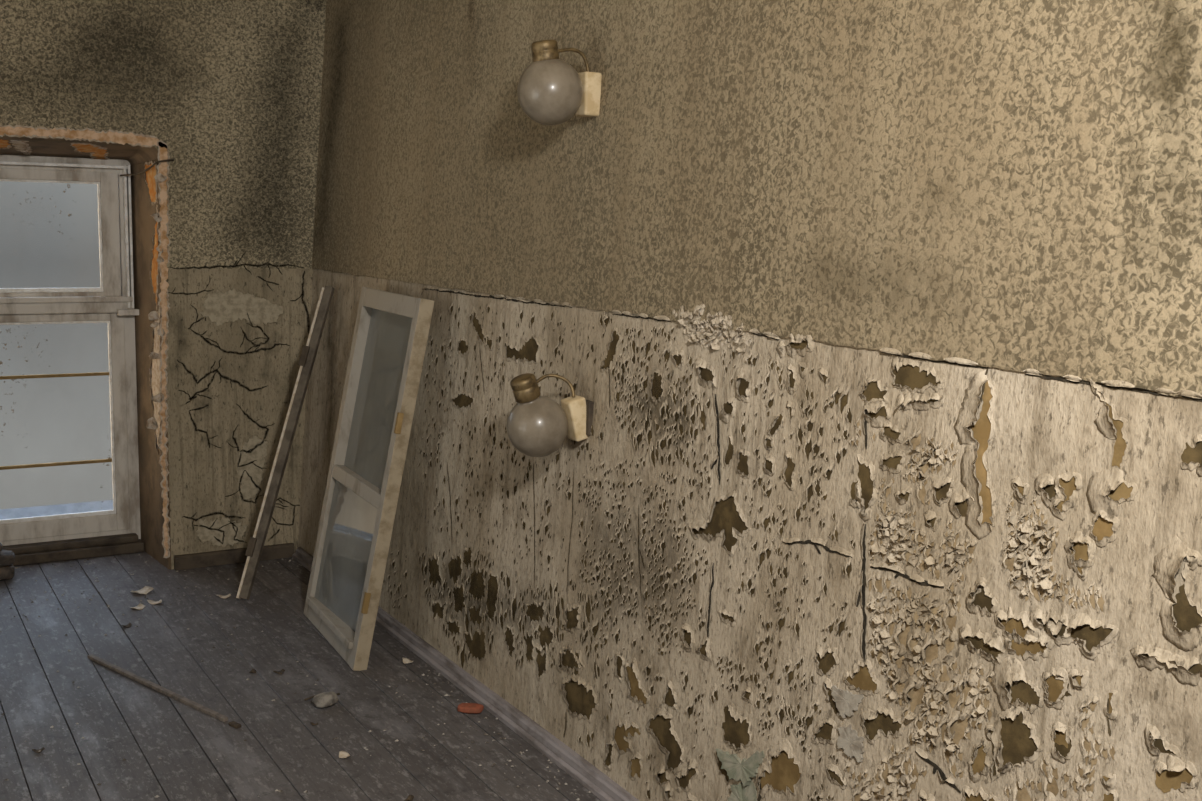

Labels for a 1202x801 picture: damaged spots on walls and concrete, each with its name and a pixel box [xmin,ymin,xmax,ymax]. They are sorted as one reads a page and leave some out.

crack [167,253,310,544]
peeling [1180,434,1202,477]
peeling [383,299,1138,801]
peeling [1130,535,1202,686]
peeling [1144,723,1198,793]